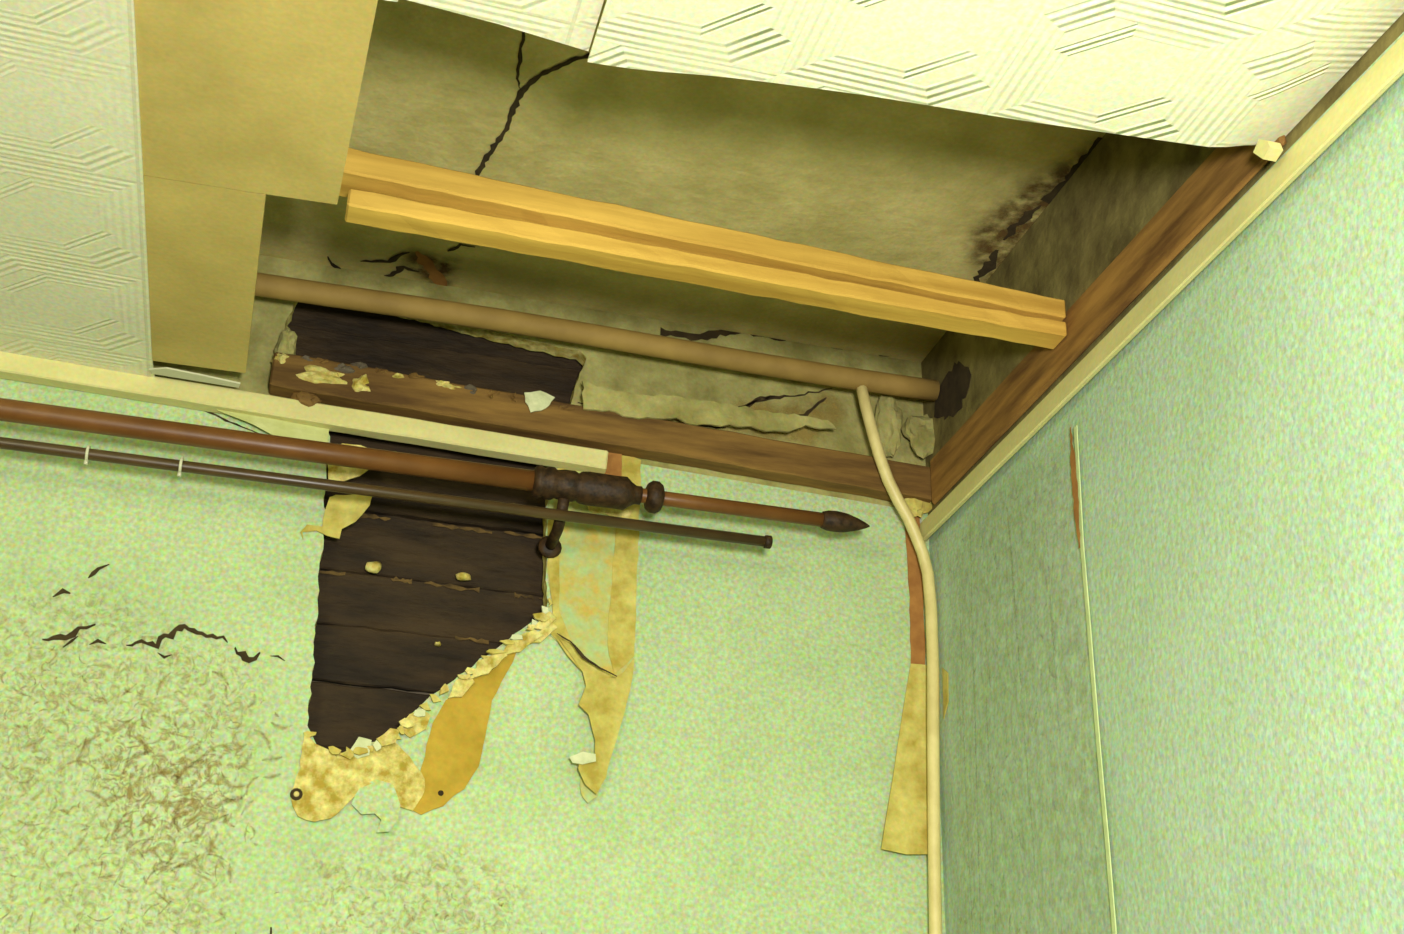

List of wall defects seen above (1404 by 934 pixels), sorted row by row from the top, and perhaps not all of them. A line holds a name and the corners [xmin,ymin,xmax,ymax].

crack [475,31,590,176]
crack [973,137,1102,282]
peeling [271,327,836,433]
peeling [875,361,971,459]
spalling [605,452,622,476]
spalling [300,465,372,539]
spalling [588,506,632,518]
crack [53,564,109,597]
spalling [365,561,382,573]
spalling [456,572,471,581]
crack [42,624,285,663]
spalling [290,598,557,833]